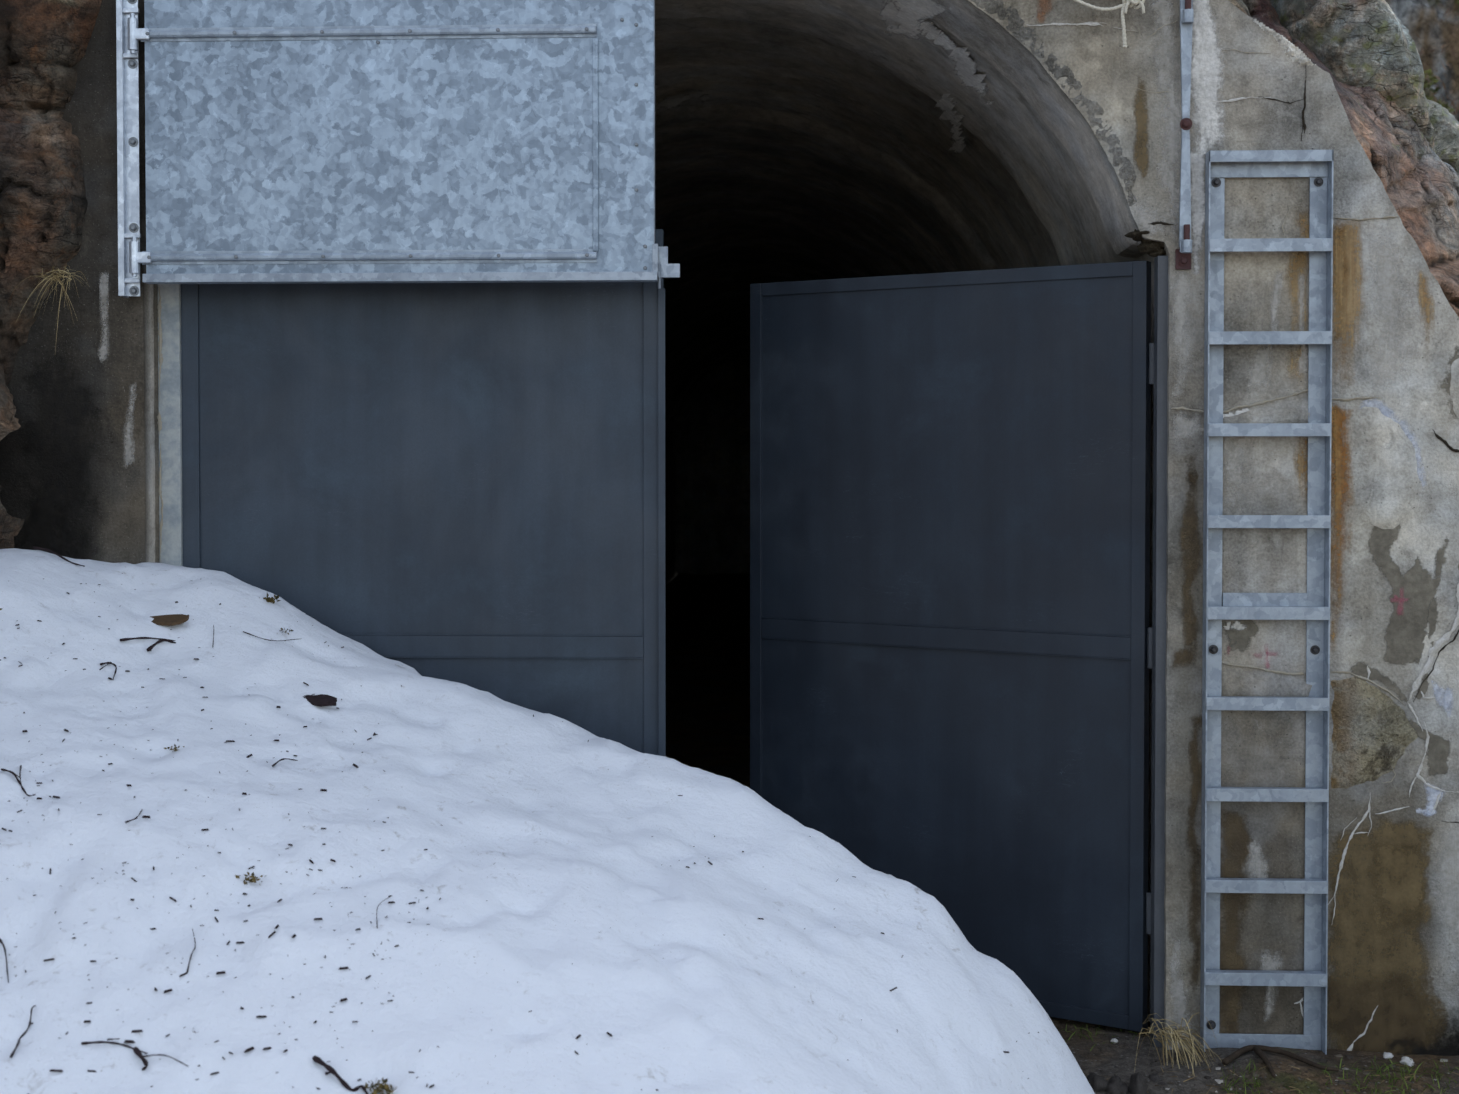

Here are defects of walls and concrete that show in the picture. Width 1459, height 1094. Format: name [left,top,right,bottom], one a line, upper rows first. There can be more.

corrosion [1333,225,1362,363]
crack [1432,429,1459,453]
water stain [1350,525,1453,713]
crack [1328,584,1459,922]
water stain [1327,719,1459,1055]